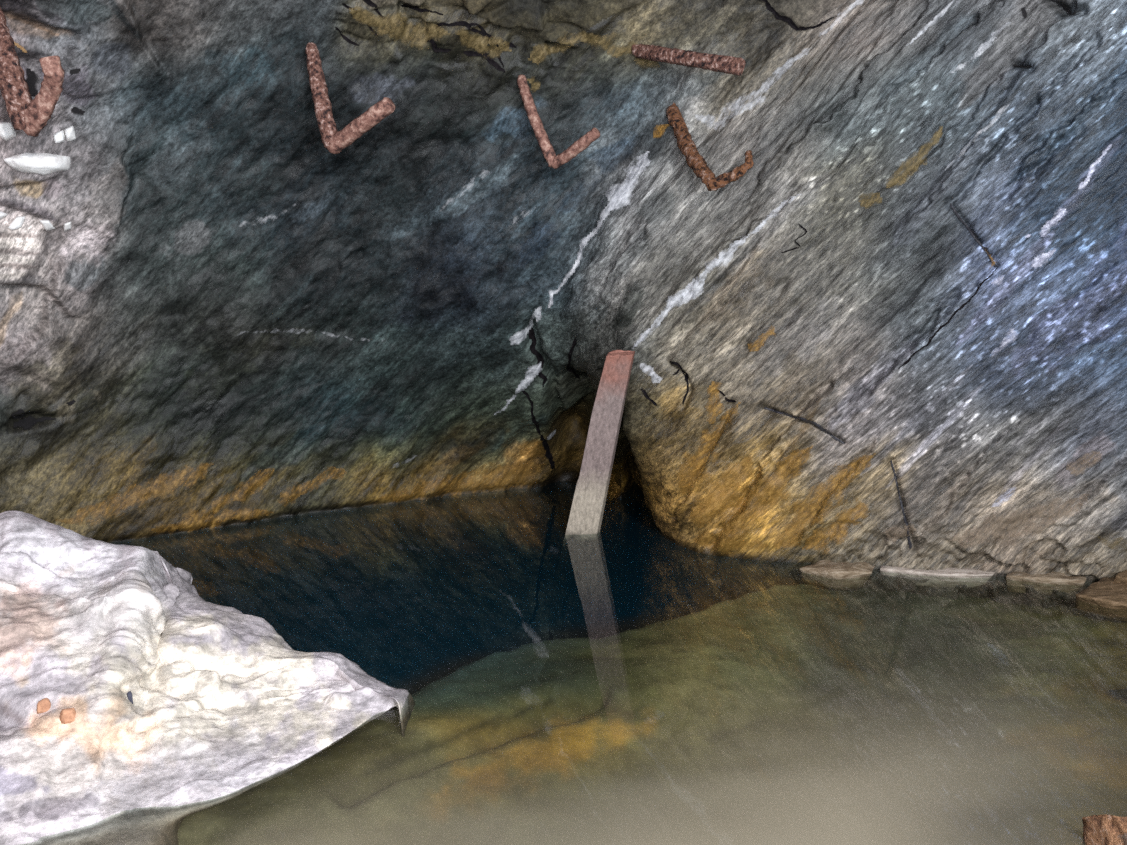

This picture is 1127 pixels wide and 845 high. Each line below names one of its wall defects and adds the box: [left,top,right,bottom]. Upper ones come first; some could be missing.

crack [335,0,516,72]